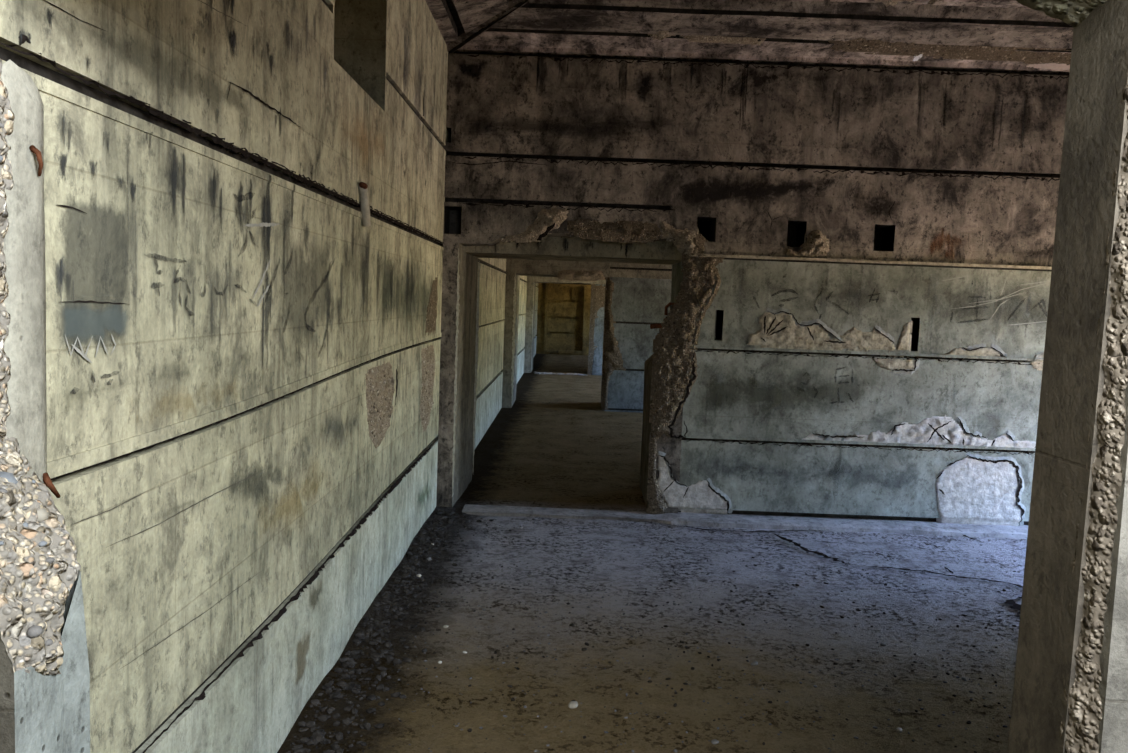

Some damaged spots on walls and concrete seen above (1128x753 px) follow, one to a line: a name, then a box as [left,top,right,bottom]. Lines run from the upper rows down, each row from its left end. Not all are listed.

spalling [786,220,831,257]
spalling [0,34,81,675]
spalling [500,208,733,515]
peeling [747,308,920,375]
peeling [803,415,1036,526]
crack [668,524,1023,614]